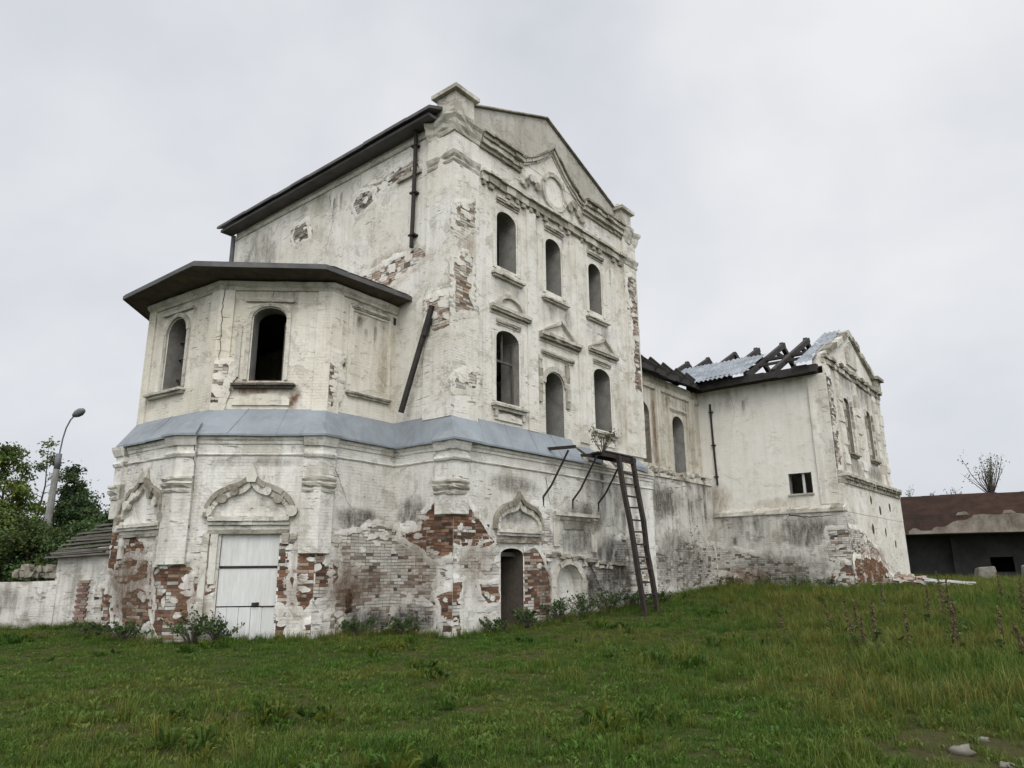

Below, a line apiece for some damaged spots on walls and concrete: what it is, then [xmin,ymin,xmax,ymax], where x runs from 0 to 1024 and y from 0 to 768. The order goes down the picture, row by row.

spalling [350,152,423,221]
spalling [359,241,426,288]
spalling [422,195,480,338]
crack [210,289,226,402]
spalling [210,357,239,410]
spalling [624,272,642,398]
spalling [93,516,217,643]
spalling [274,495,501,639]
spalling [523,499,557,627]
water stain [653,490,673,516]
spalling [582,522,895,612]
water stain [788,522,824,545]